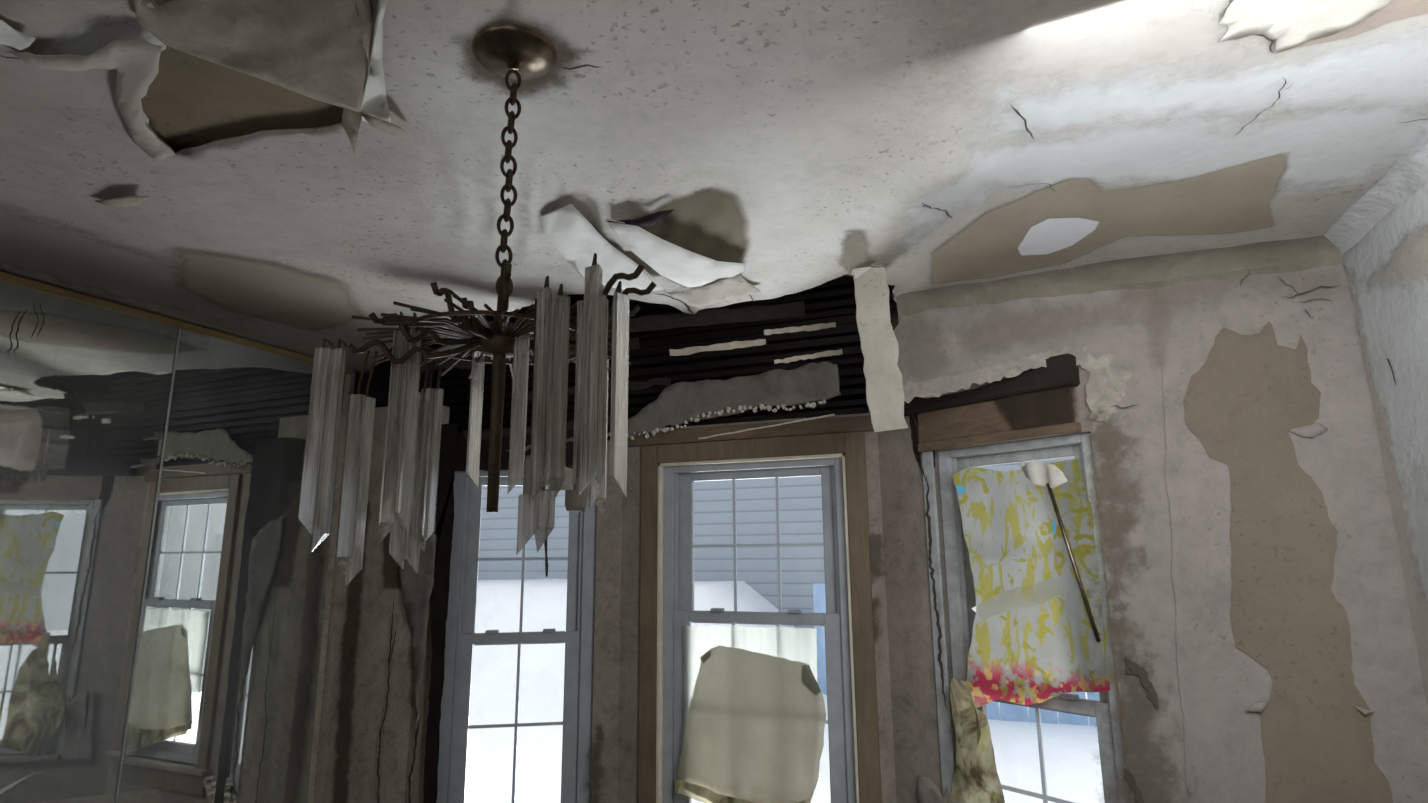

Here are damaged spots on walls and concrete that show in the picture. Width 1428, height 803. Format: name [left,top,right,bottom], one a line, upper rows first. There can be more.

peeling [141,46,343,152]
peeling [1218,0,1428,53]
spalling [352,274,868,803]
peeling [1184,321,1393,803]